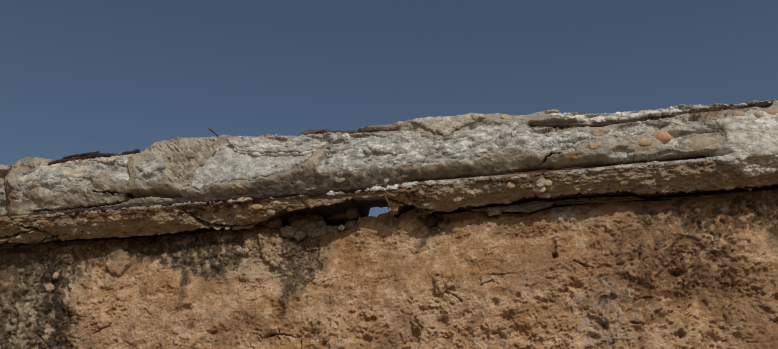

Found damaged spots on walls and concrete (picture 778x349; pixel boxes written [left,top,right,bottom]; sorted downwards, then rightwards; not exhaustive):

corrosion [530,102,778,131]
corrosion [22,149,140,168]
spalling [187,100,778,190]
corrosion [0,168,19,221]
crack [3,191,134,238]
crack [458,184,775,209]